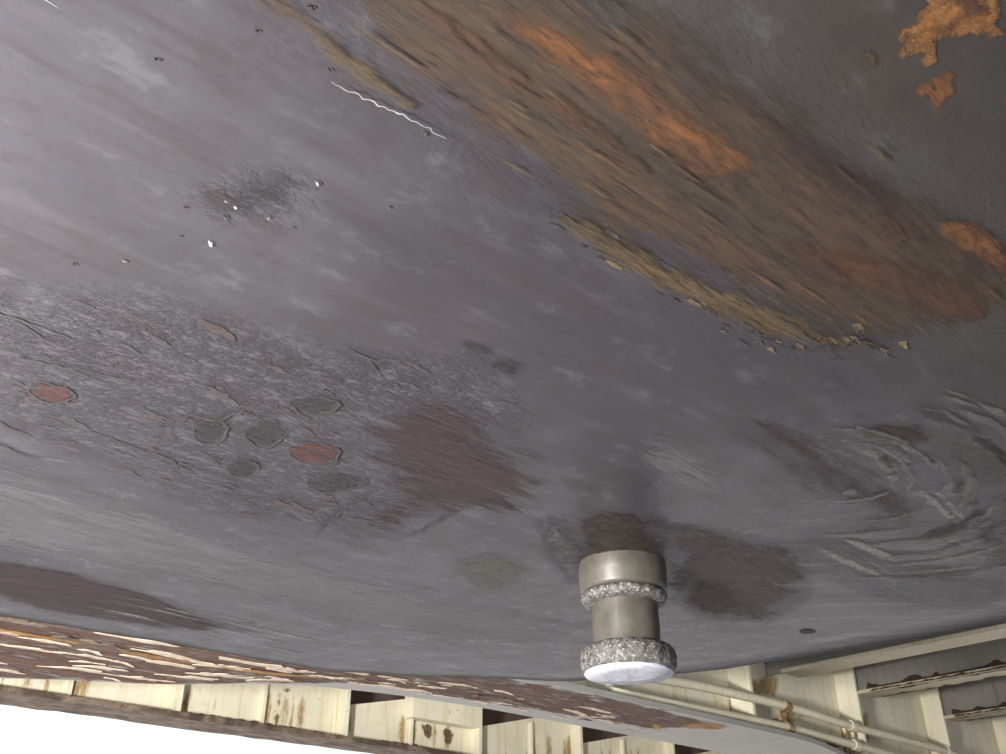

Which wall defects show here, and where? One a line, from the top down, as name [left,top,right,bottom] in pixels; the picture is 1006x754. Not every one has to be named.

corrosion [916,71,954,109]
corrosion [898,0,1006,67]
water stain [362,402,540,524]
water stain [0,470,552,654]